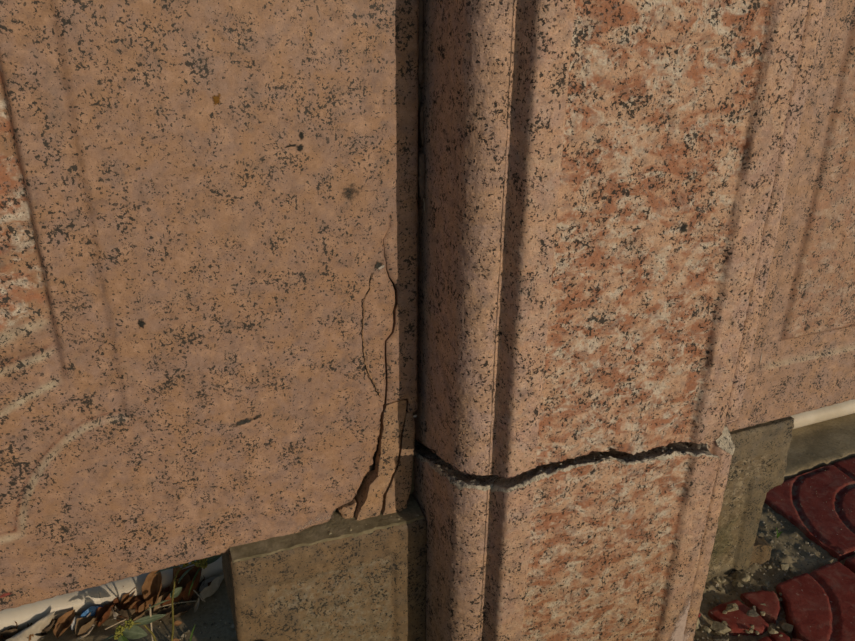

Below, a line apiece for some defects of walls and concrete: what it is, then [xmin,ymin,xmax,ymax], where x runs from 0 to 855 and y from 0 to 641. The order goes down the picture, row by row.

crack [332,272,735,520]